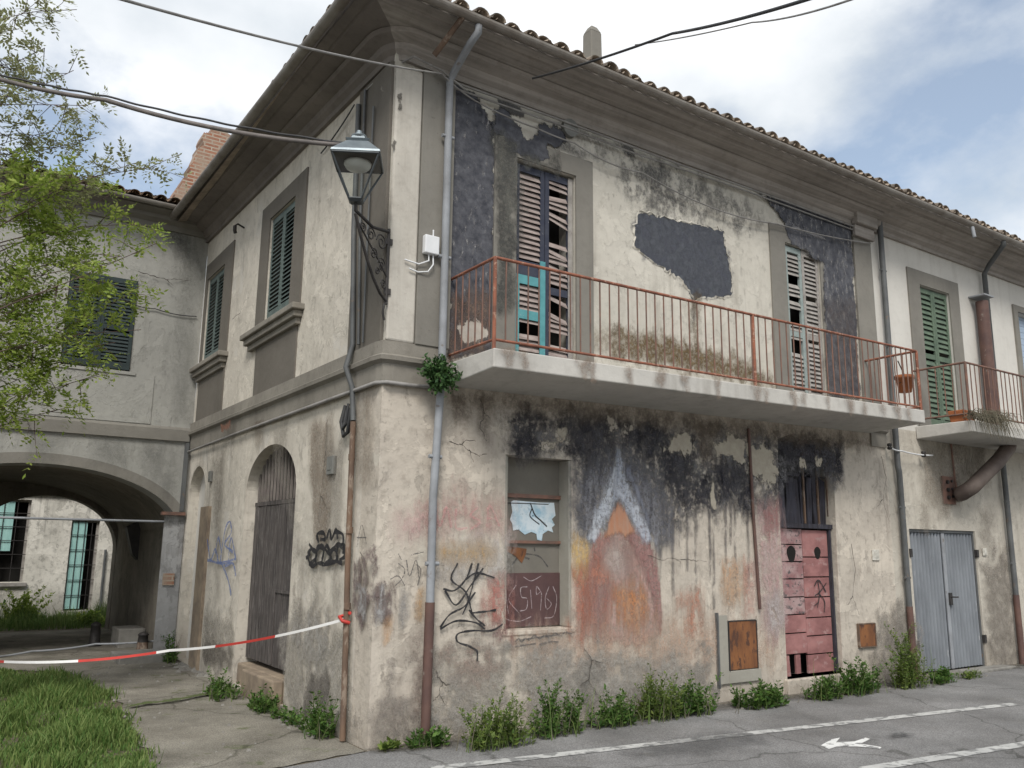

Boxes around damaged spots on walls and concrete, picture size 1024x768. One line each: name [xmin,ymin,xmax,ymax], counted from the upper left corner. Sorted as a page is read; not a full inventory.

peeling [447,84,567,363]
peeling [632,210,734,316]
water stain [622,145,752,232]
peeling [760,194,861,400]
crack [449,399,489,457]